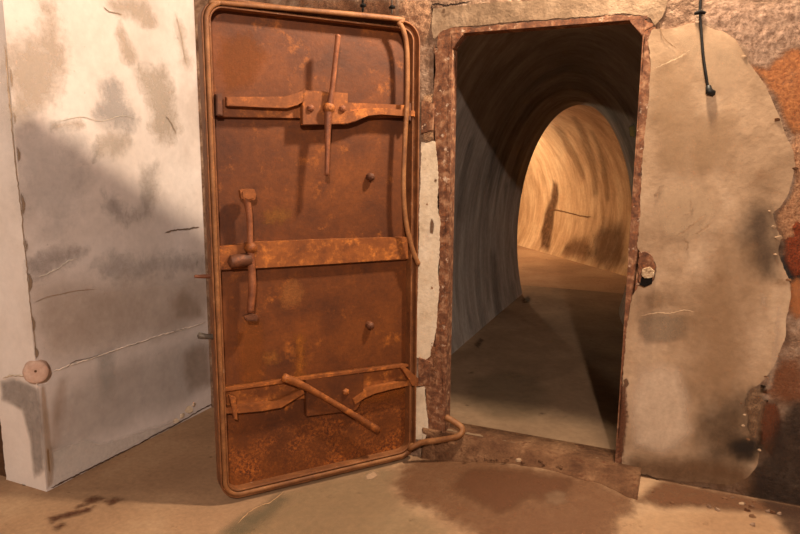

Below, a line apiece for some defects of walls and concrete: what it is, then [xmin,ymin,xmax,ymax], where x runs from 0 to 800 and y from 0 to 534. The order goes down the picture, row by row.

crack [5,50,93,349]
spalling [767,134,800,281]
crack [54,322,205,371]
damp [2,381,42,471]
corrosion [359,387,405,405]
corrosion [618,384,628,458]
damp [397,459,632,534]